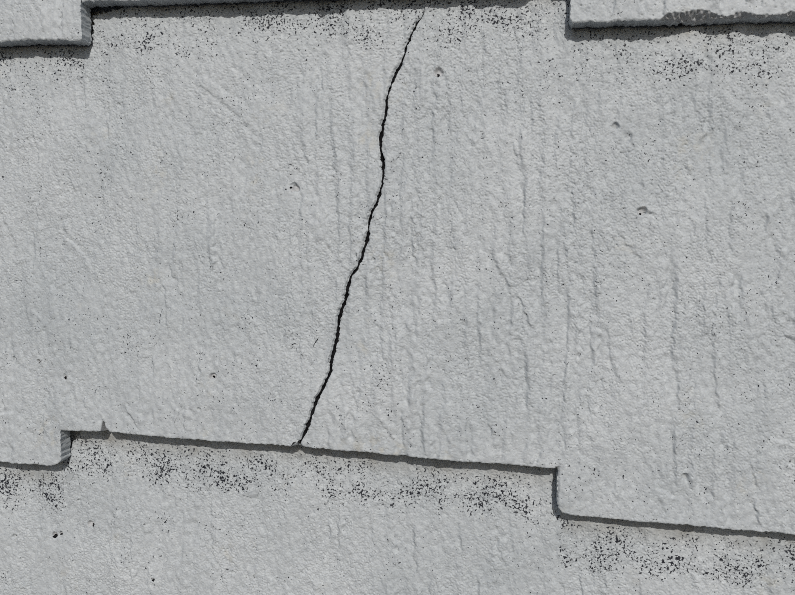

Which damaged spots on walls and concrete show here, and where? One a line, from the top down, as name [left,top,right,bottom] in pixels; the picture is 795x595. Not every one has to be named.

crack [291,10,425,446]